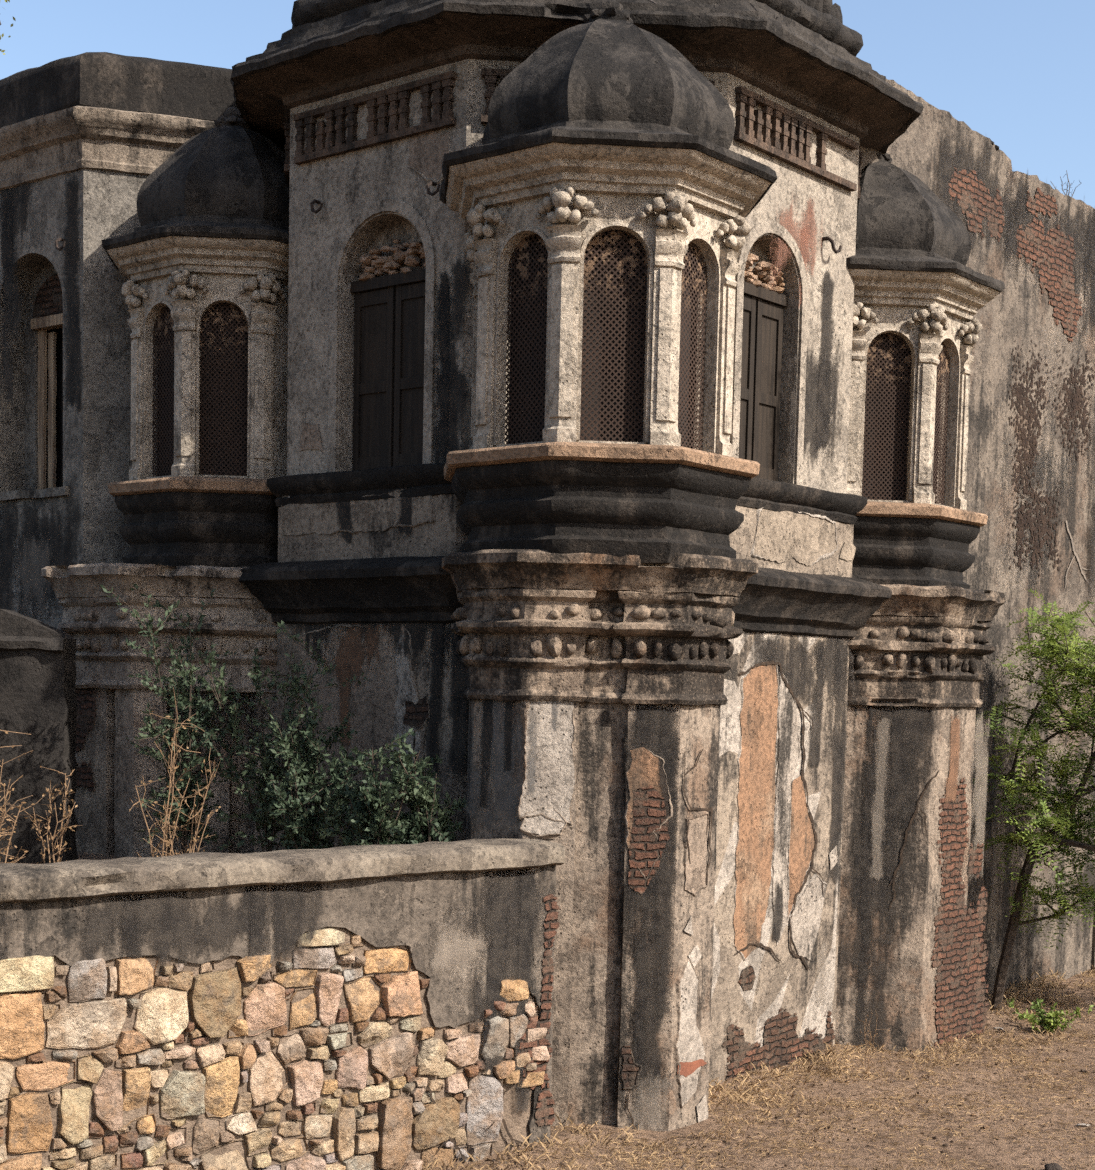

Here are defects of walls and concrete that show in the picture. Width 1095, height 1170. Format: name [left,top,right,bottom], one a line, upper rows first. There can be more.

water stain [0,183,29,403]
water stain [63,175,81,411]
water stain [432,260,470,463]
water stain [933,127,1095,331]
flaking render [948,167,1095,577]
water stain [0,479,81,619]
flaking render [624,747,673,895]
water stain [624,704,679,1097]
flaking render [733,664,838,991]
flaking render [931,717,990,1046]
peeling [674,916,708,1123]
flaking render [722,1008,836,1081]